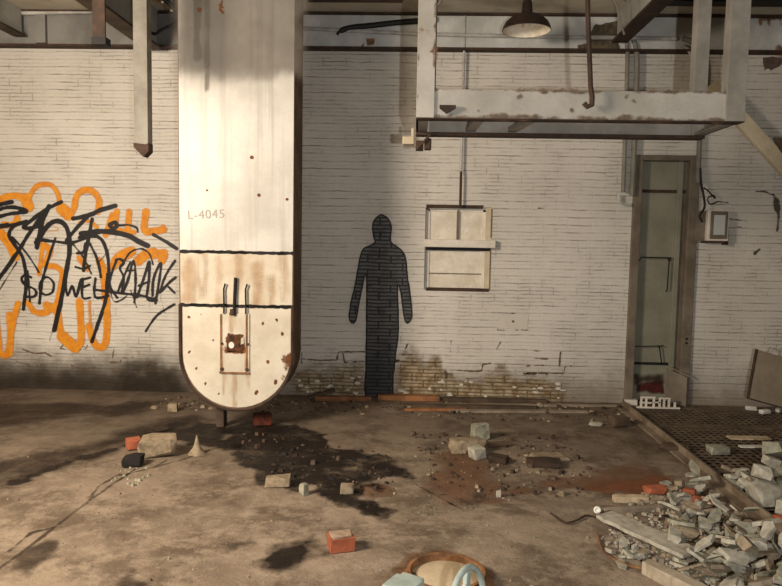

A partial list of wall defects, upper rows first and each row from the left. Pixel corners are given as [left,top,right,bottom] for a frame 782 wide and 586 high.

spalling [763,56,782,73]
leakage [0,362,177,392]
rust [274,353,291,385]
peeling [295,365,361,396]
peeling [398,358,566,399]
leakage [0,403,145,425]